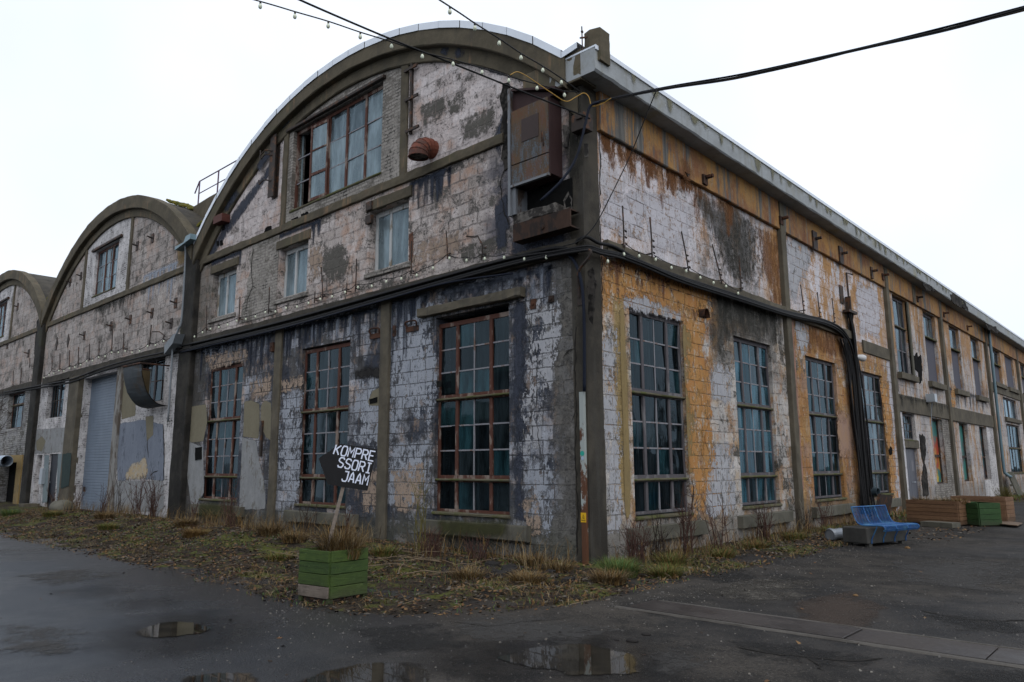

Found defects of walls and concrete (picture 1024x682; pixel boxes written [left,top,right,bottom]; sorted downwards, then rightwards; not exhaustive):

spalling [500,82,510,171]
leakage [410,166,451,205]
rust [600,134,704,222]
leakage [698,195,764,283]
peeling [125,457,148,480]
peeling [277,386,304,509]
peeling [352,301,439,506]
peeling [520,296,563,537]
peeling [706,439,736,519]
peeling [710,362,733,406]
rust [808,326,843,357]